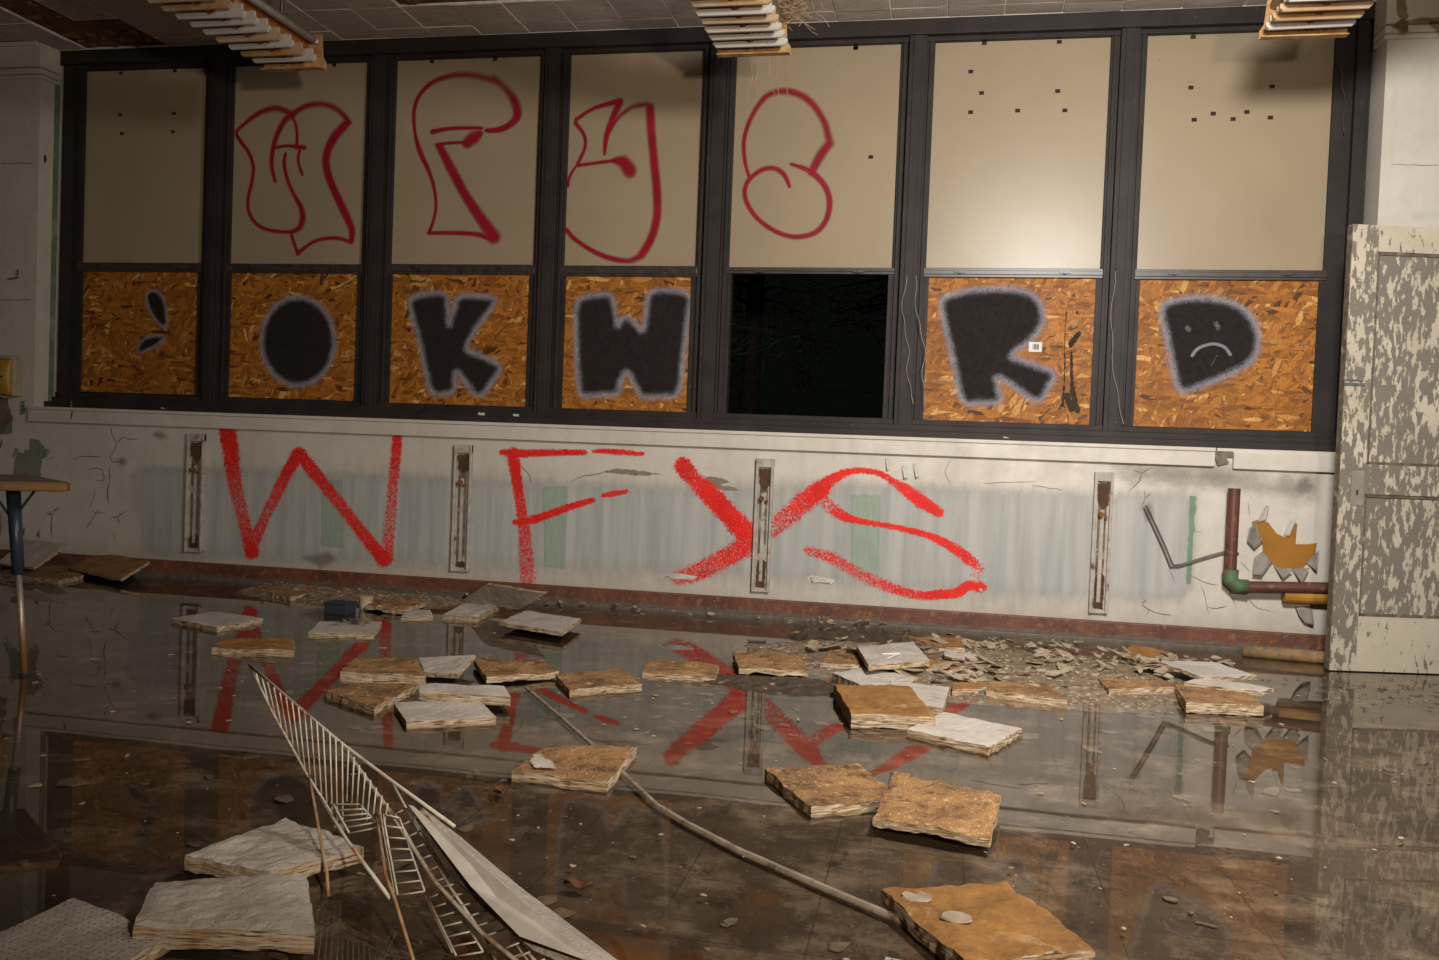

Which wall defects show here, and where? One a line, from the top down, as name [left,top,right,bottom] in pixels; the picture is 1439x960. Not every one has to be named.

peeling [0,397,50,477]
peeling [1247,504,1319,582]